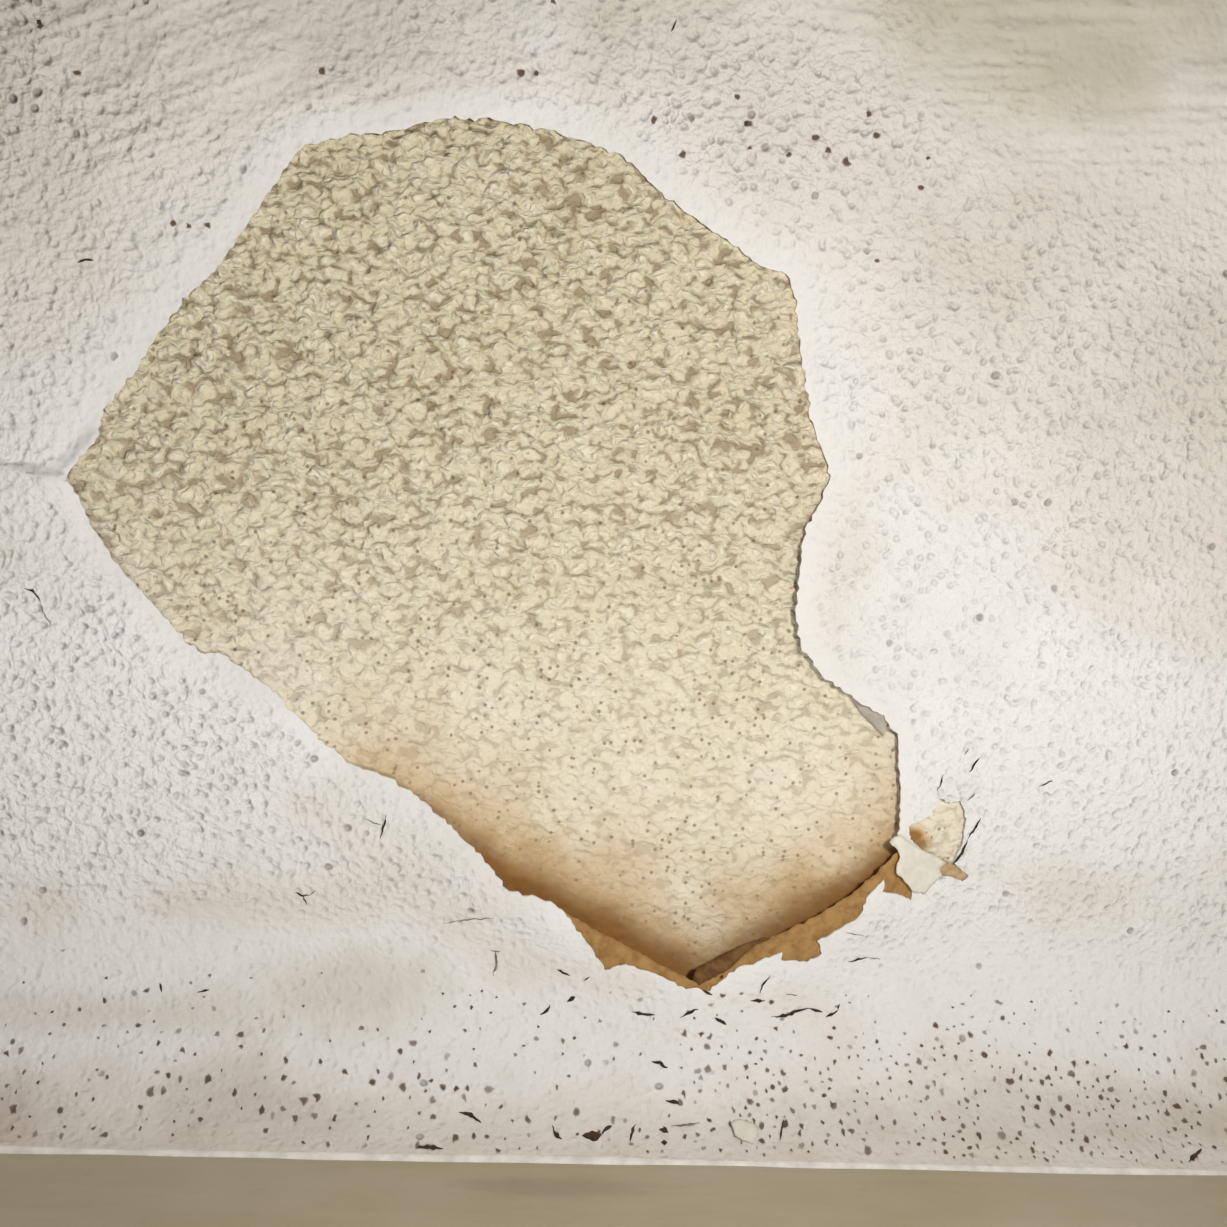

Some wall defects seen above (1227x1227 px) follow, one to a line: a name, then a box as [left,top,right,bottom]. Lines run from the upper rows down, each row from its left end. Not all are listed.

peeling [67,116,968,1045]